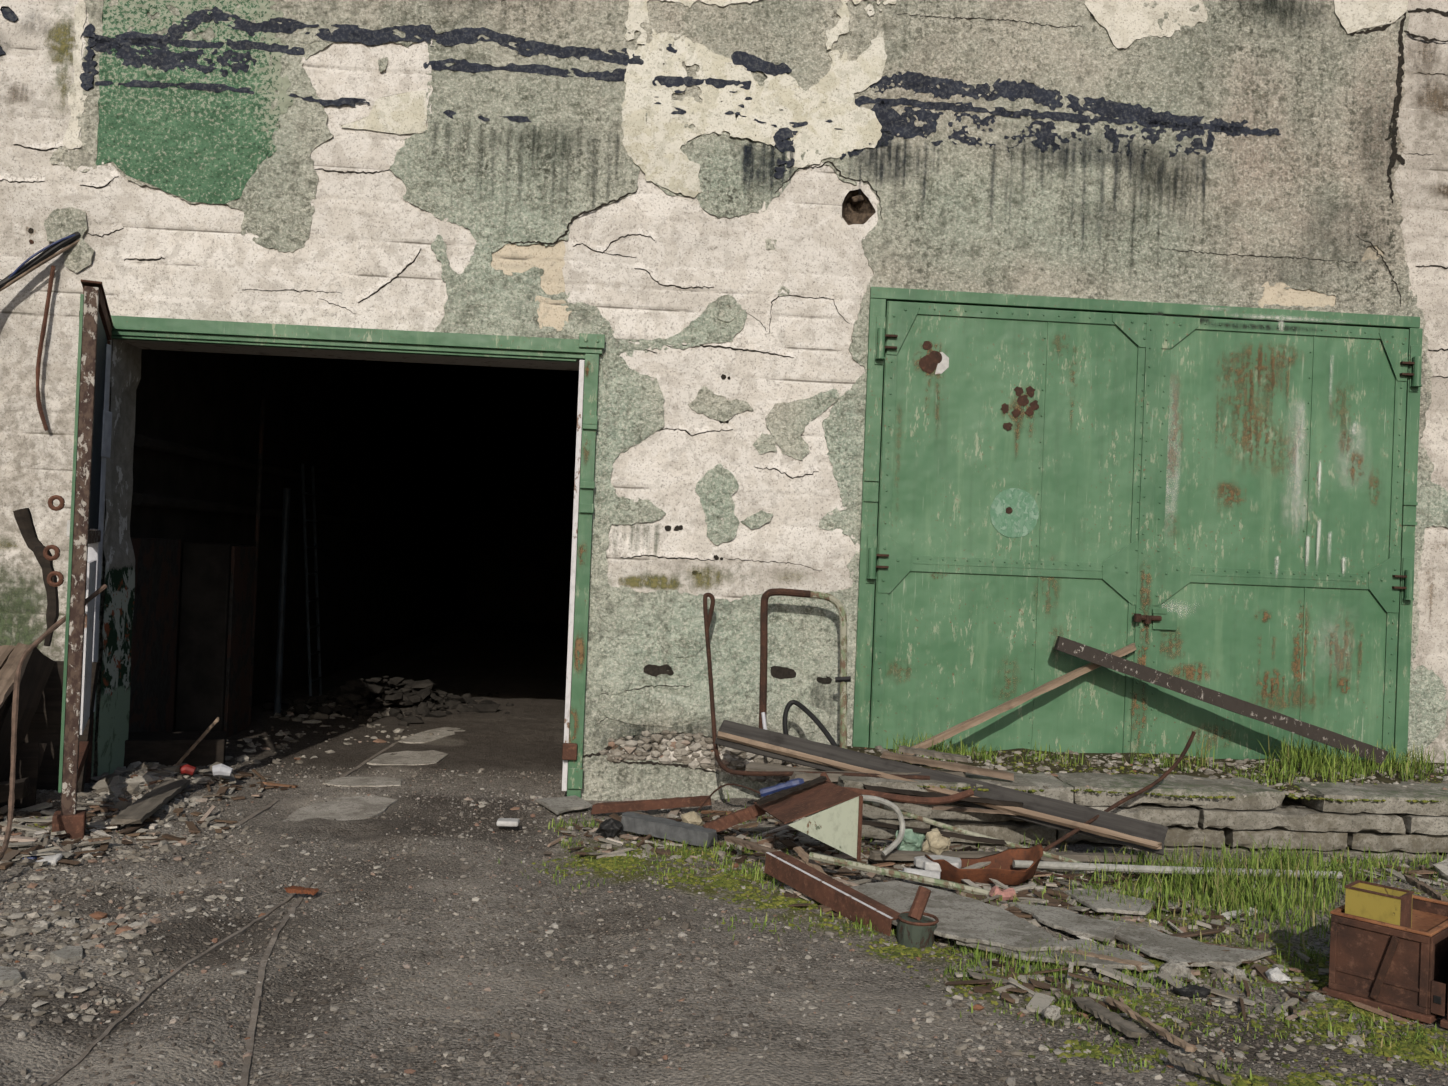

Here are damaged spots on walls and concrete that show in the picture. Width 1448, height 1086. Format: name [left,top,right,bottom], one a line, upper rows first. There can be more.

crack [1350,8,1448,203]
leakage [743,140,793,180]
leakage [860,139,927,197]
leakage [1053,140,1206,207]
crack [245,246,421,314]
flaking render [1394,0,1448,492]
flaking render [0,0,476,661]
flaking render [491,158,879,602]
corrosion [1001,386,1039,449]
corrosion [1231,354,1289,454]
corrosion [1258,613,1308,705]
flaking render [1412,526,1448,763]